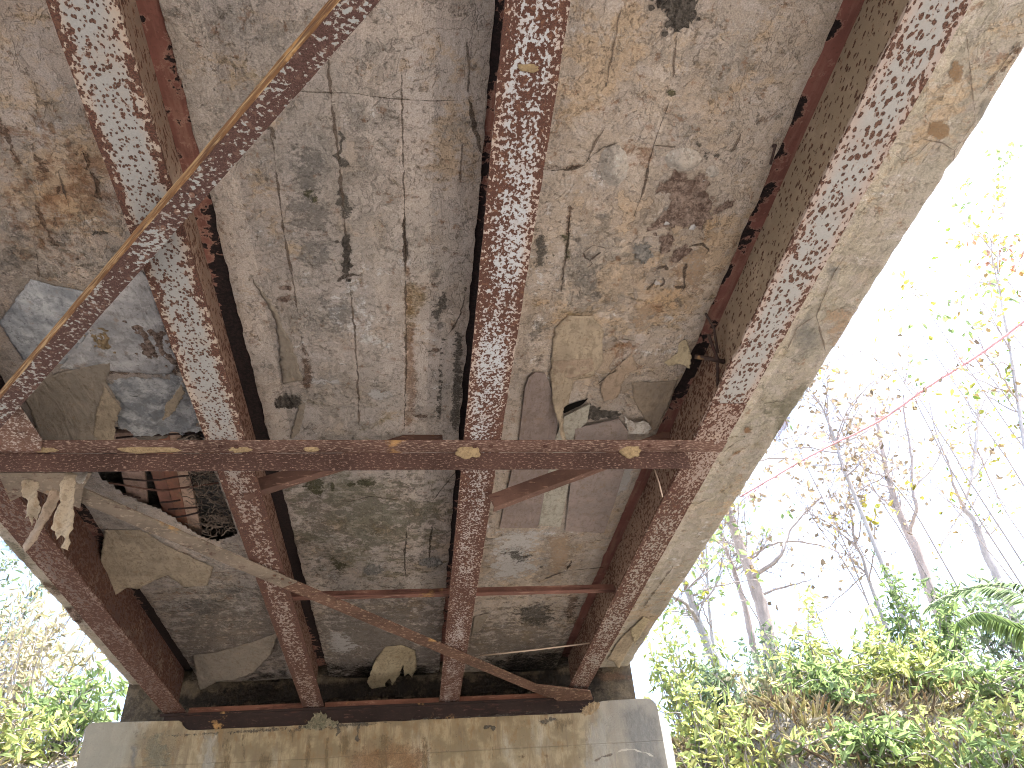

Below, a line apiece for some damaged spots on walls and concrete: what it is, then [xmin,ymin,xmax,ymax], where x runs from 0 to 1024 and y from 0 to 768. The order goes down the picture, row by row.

rust [949,61,964,83]
rust [42,151,102,201]
crack [634,90,676,215]
rust [928,120,950,140]
crack [302,42,482,425]
peeling [0,279,84,360]
peeling [25,271,203,440]
peeling [550,315,678,440]
peeling [664,339,692,369]
rust [821,308,855,347]
peeling [101,530,214,595]
peeling [193,634,277,690]